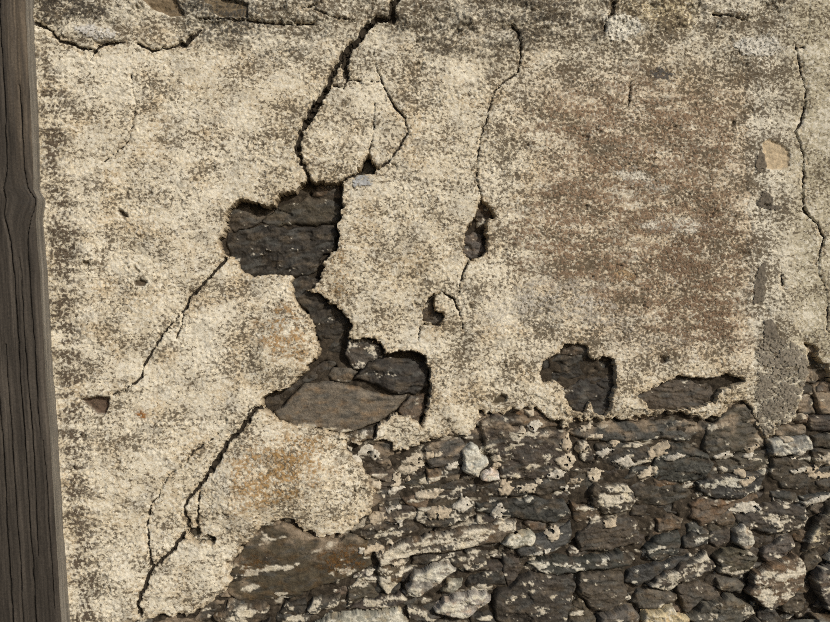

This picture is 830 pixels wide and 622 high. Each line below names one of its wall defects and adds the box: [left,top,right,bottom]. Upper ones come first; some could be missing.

crack [476,26,522,198]
crack [794,28,825,286]
spalling [82,396,110,415]
crack [113,257,228,395]
crack [137,405,264,614]
spalling [217,176,445,529]
spalling [415,488,472,520]
crack [427,262,468,329]
spalling [462,198,496,261]
spalling [490,341,746,519]
spalling [727,501,762,514]
spalling [789,449,830,479]